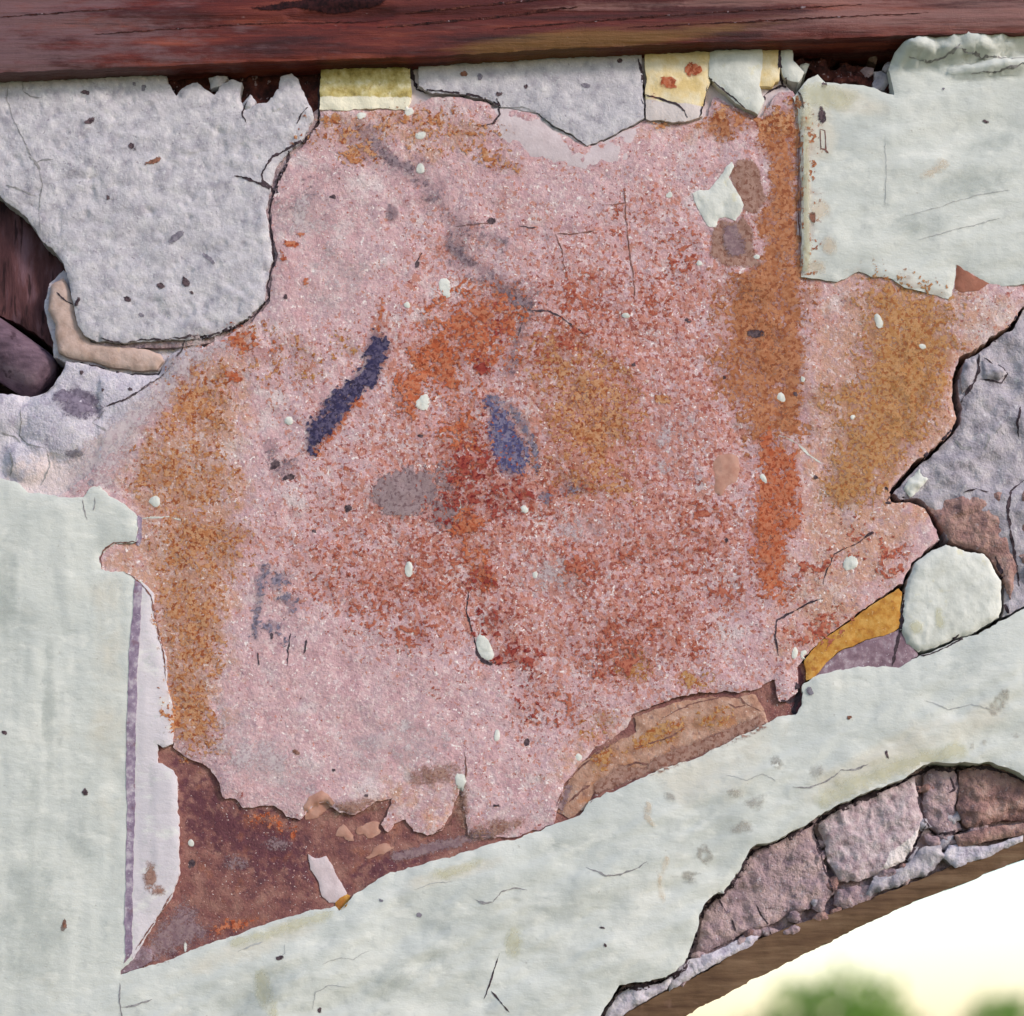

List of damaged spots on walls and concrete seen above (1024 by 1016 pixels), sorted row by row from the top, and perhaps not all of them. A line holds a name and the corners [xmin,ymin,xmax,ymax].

crack [1,384,57,483]
spalling [44,270,178,391]
crack [93,77,321,431]
corrosion [123,320,364,763]
corrosion [391,95,968,794]
spalling [890,309,1024,624]
corrosion [244,812,297,839]
peeling [122,744,584,974]
corrosion [410,765,521,840]
crack [586,862,646,876]
spalling [601,764,1024,1016]
crack [602,764,1024,1013]